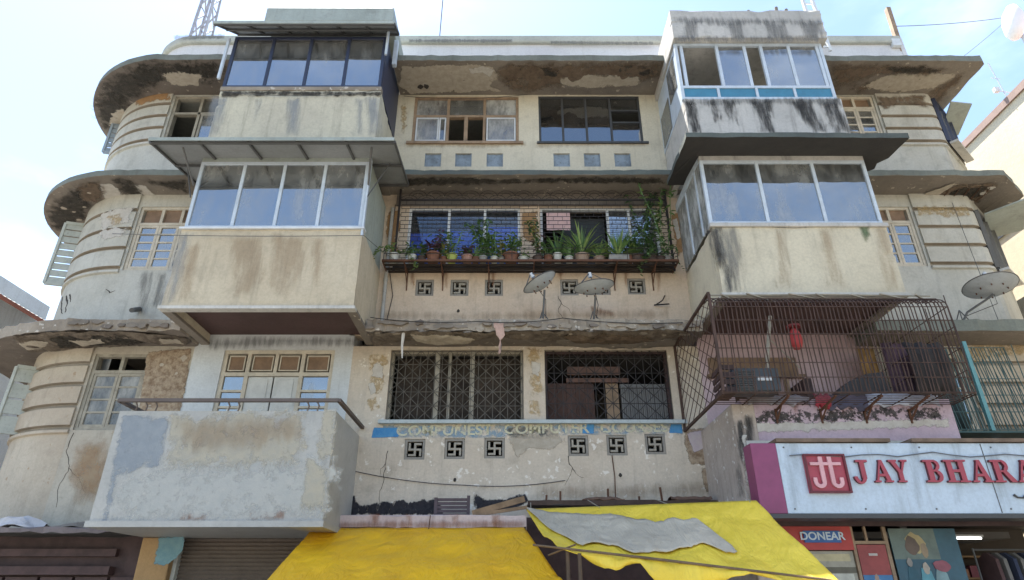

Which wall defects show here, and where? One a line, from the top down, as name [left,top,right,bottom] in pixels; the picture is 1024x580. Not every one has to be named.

flaking render [135,71,202,105]
flaking render [398,62,660,95]
flaking render [861,72,955,93]
flaking render [109,109,124,129]
leakage [686,99,735,133]
leakage [750,99,775,132]
peeling [87,183,132,240]
leakage [708,228,738,289]
spalling [358,309,700,346]
peeling [14,319,339,521]
crack [56,433,84,507]